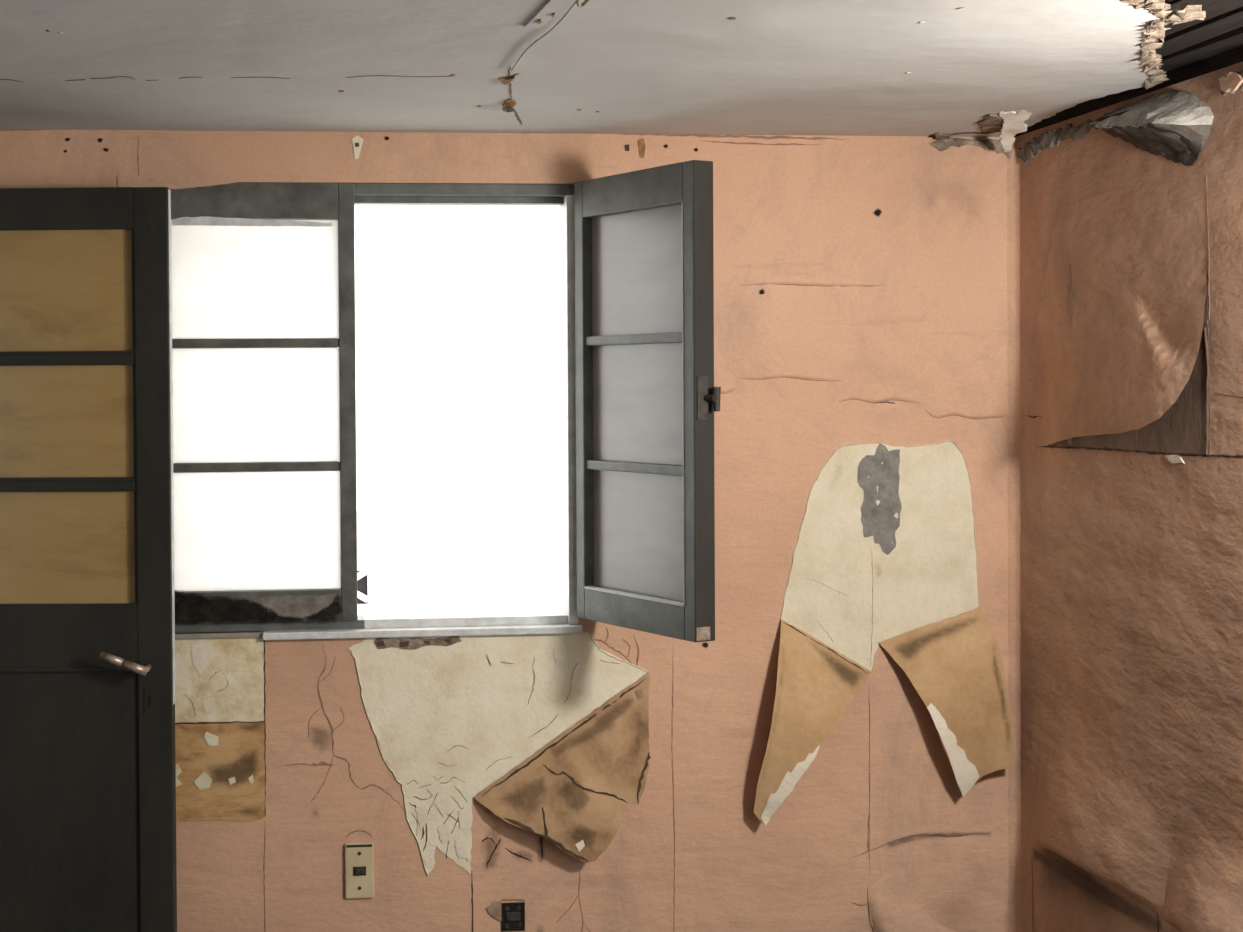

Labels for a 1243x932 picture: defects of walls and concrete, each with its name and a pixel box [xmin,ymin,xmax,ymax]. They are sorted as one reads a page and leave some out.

crack [508,66,528,134]
crack [622,134,844,145]
peeling [1090,0,1214,166]
flaking render [781,442,979,671]
peeling [176,764,212,790]
flaking render [175,637,265,746]
crack [283,643,559,869]
flaking render [348,632,648,874]